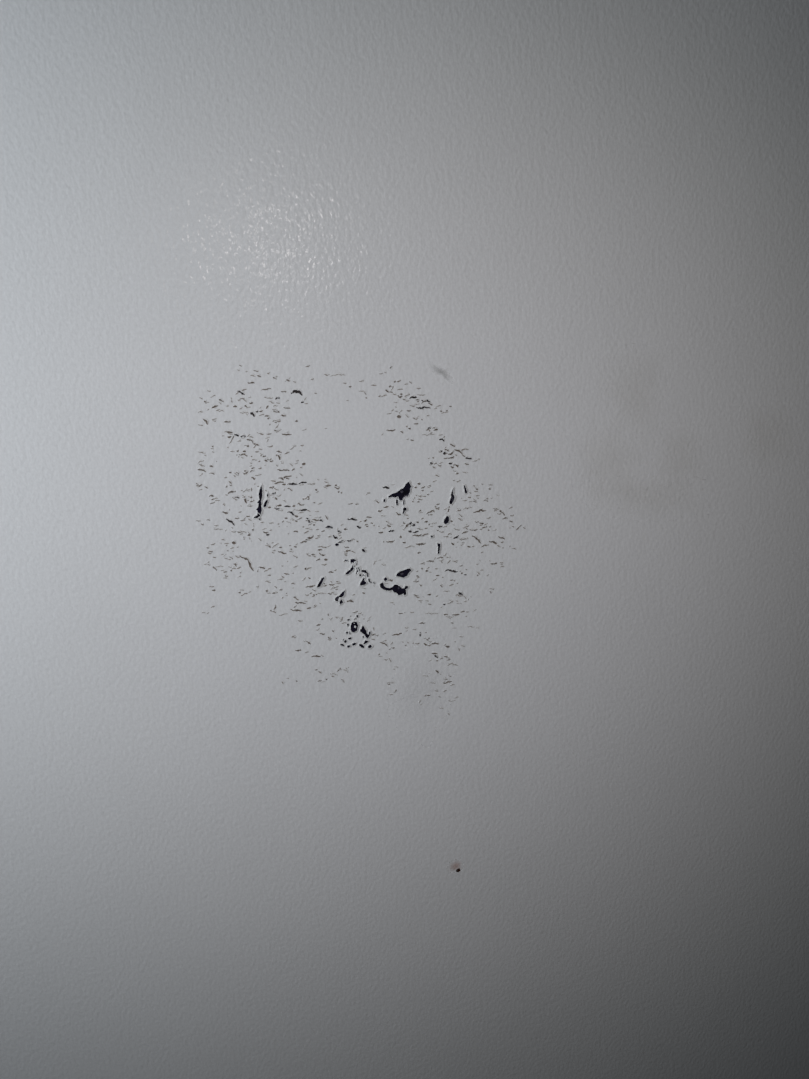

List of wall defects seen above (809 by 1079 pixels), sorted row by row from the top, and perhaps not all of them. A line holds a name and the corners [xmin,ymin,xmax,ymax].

peeling [381,479,413,517]
peeling [441,486,457,526]
peeling [333,547,414,606]
peeling [339,614,374,650]